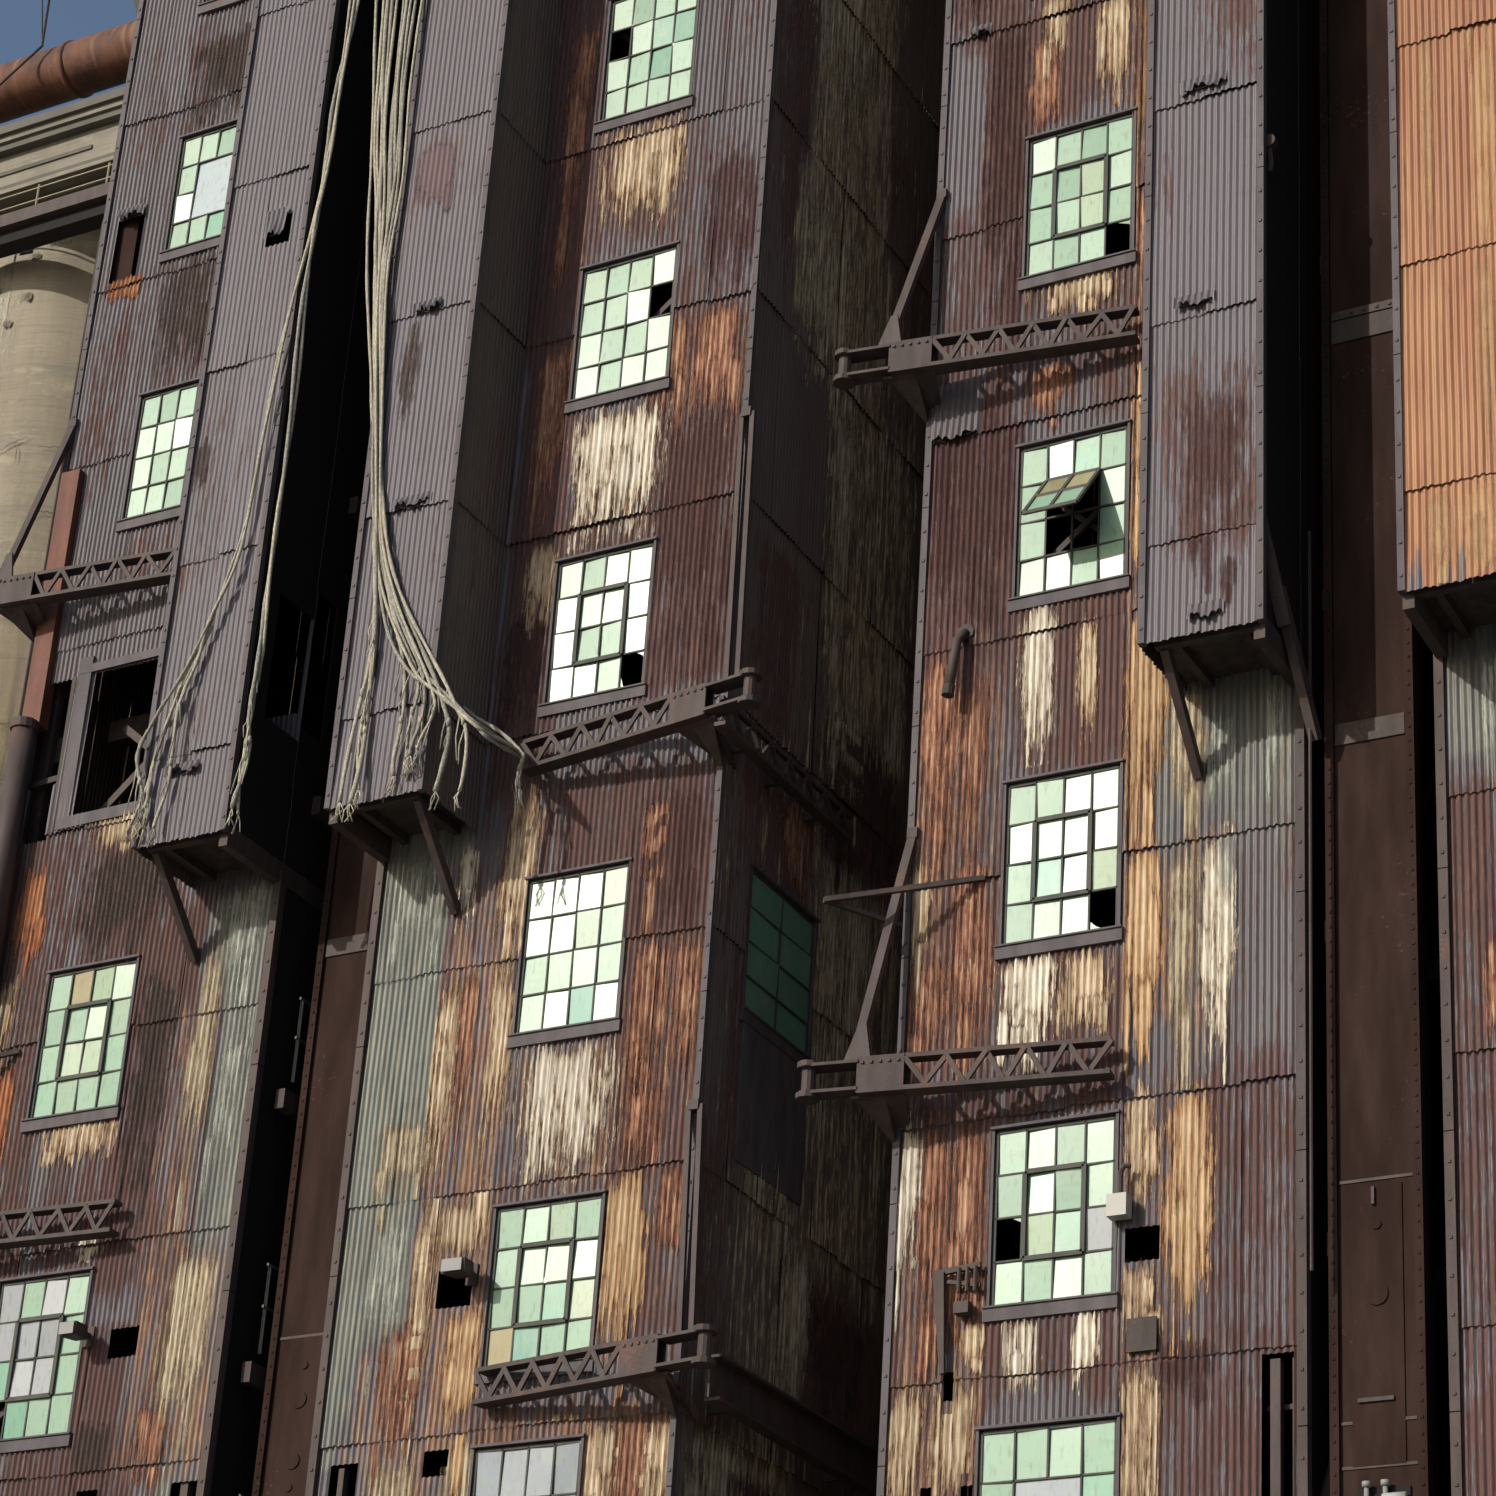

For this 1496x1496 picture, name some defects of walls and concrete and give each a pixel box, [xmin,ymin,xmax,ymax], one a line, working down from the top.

rust [103,249,217,389]
rust [523,329,573,554]
rust [0,1064,19,1181]
rust [10,862,49,989]
peeling [363,782,656,1496]
rust [614,780,715,1257]
peeling [992,357,1239,1496]